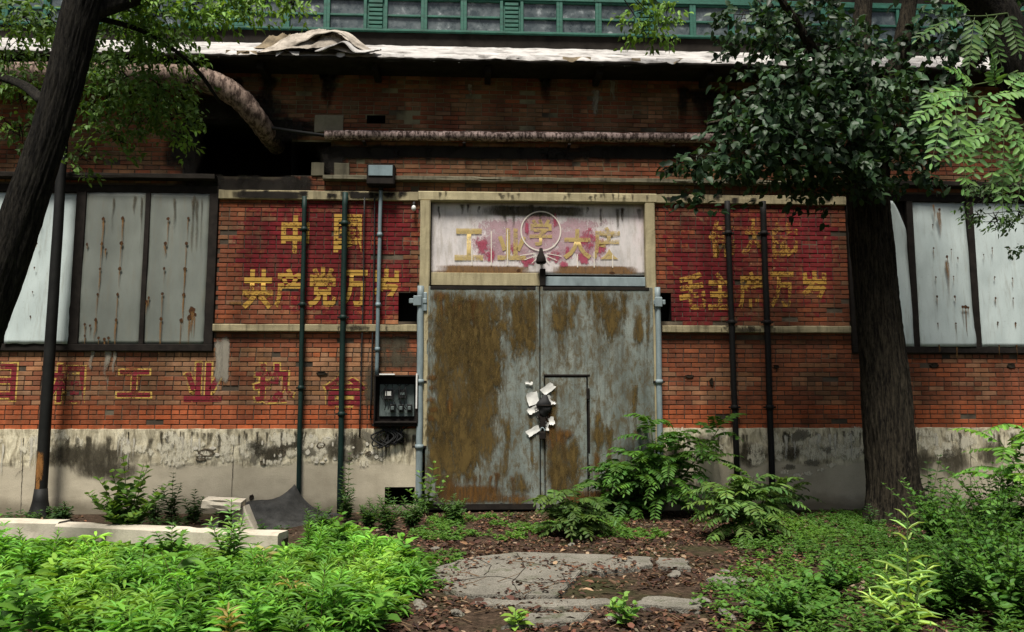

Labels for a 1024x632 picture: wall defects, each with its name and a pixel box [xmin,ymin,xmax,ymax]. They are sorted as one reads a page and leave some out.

rust [933,247,969,329]
rust [551,291,650,360]
rust [425,291,538,504]
peeling [19,433,38,454]
peeling [50,429,83,452]
leakage [49,436,135,480]
leakage [147,432,221,458]
peeling [116,428,387,469]
leakage [238,430,307,461]
leakage [351,432,416,456]
rust [529,383,643,503]
leakage [917,433,969,474]